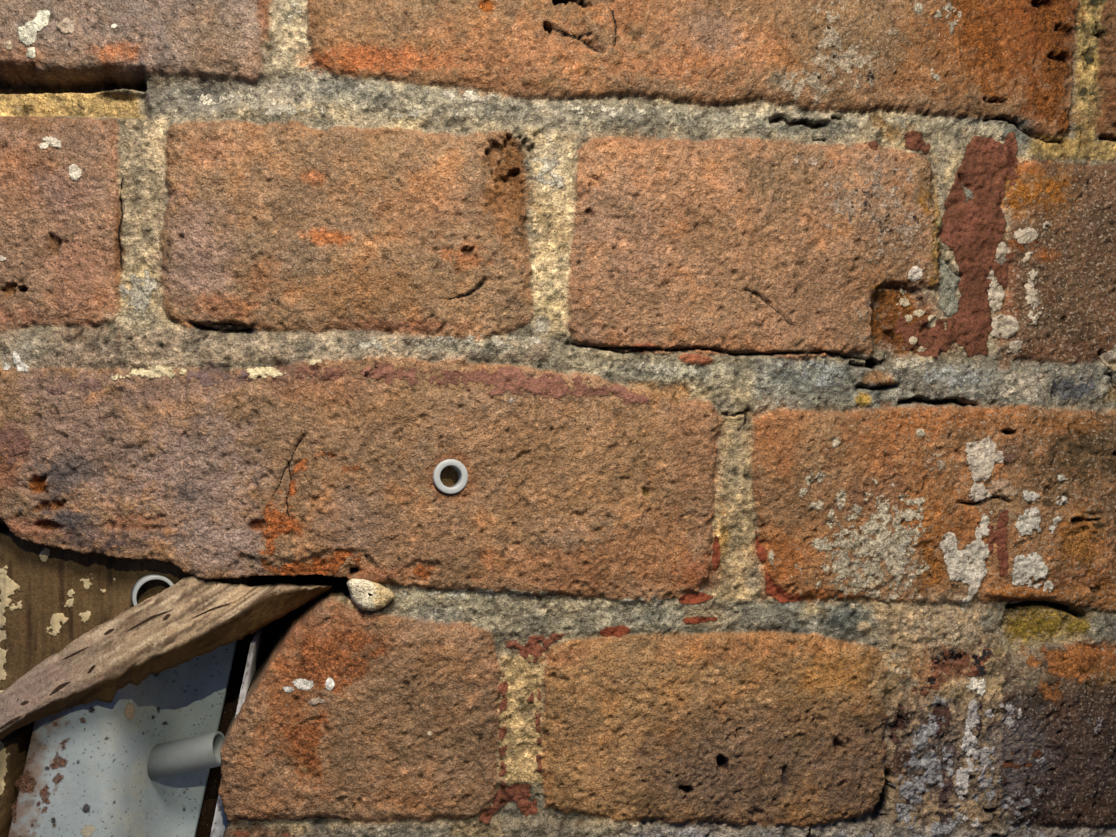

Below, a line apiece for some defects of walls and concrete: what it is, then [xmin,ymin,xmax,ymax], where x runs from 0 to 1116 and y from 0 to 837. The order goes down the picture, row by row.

crack [273,438,303,521]
damp [799,436,1068,651]